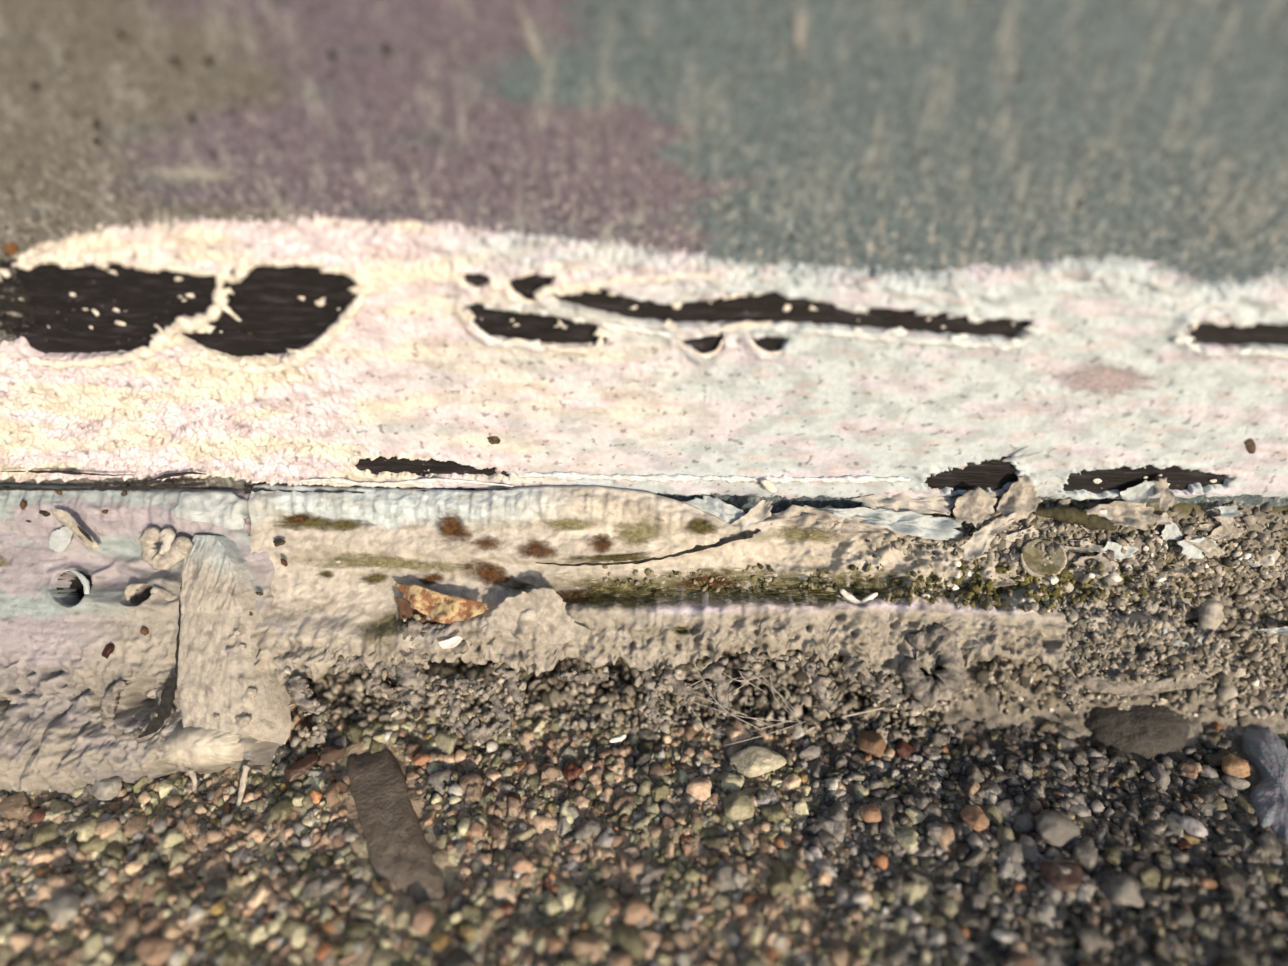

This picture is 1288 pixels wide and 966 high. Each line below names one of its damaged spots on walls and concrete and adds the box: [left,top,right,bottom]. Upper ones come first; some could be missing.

peeling [0,250,379,375]
peeling [460,271,1047,363]
peeling [1173,303,1288,360]
peeling [355,456,509,477]
peeling [682,456,1043,560]
peeling [395,583,489,649]
peeling [993,578,1016,588]